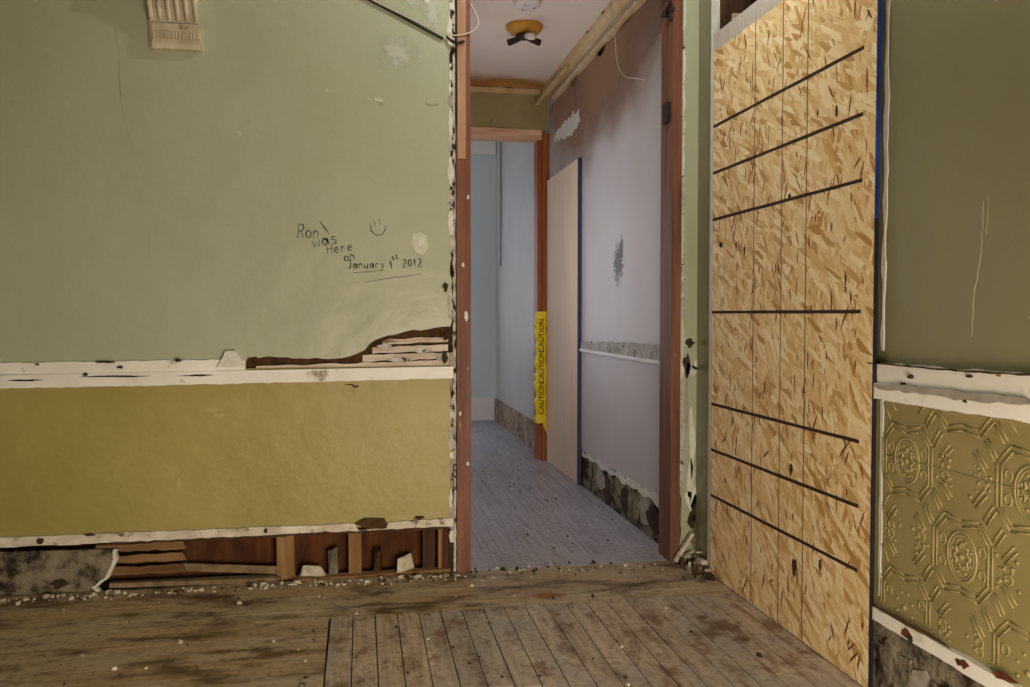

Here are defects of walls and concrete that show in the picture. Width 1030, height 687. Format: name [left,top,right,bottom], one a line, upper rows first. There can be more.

flaking render [248,291,468,362]
spalling [0,351,461,596]
peeling [871,384,1030,649]
flaking render [873,638,945,687]
peeling [991,671,1020,684]